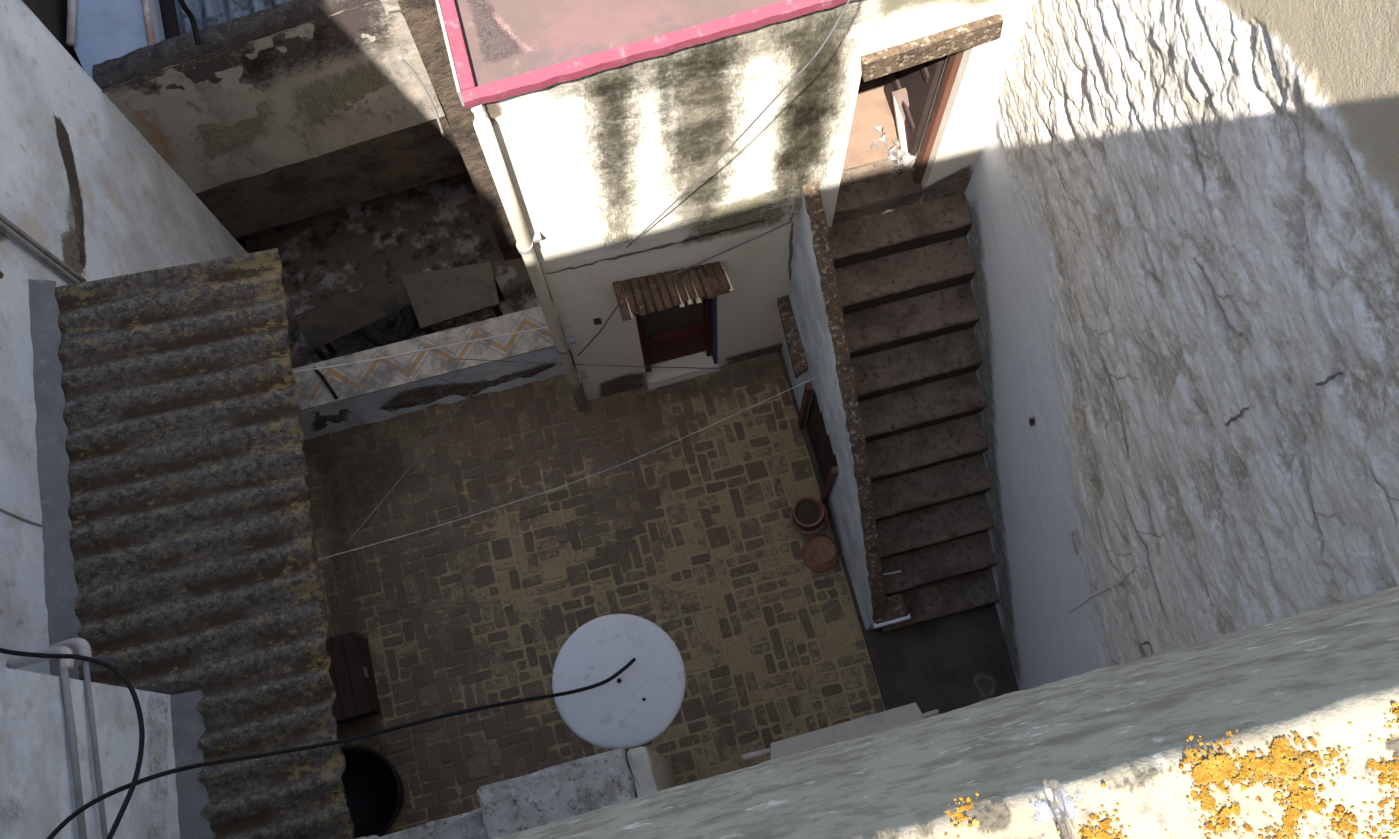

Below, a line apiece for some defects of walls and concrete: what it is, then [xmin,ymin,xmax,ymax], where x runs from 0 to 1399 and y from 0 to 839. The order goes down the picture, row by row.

water stain [549,0,936,244]
water stain [54,116,87,275]
crack [1316,372,1343,386]
crack [1225,407,1249,427]
crack [1043,780,1073,839]